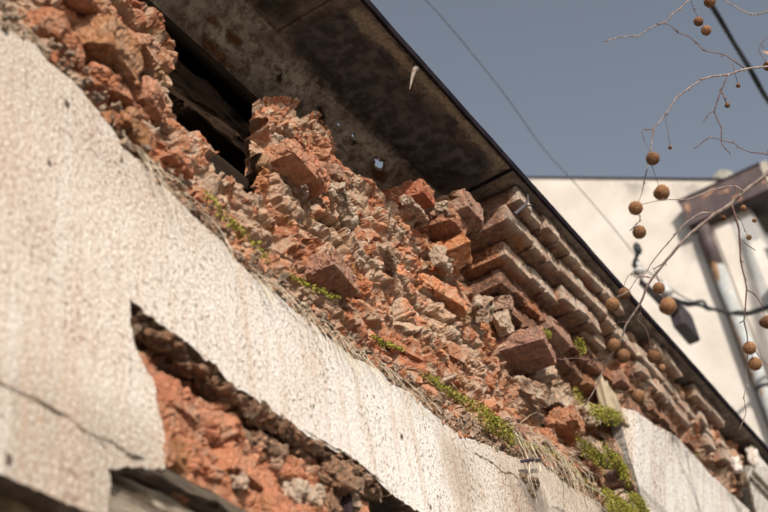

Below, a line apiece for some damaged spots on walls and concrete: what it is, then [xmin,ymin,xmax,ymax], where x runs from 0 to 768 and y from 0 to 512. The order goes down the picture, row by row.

flaking render [0,0,178,128]
leakage [294,8,505,183]
flaking render [84,62,638,512]
crack [0,381,138,463]
flaking render [583,343,748,506]